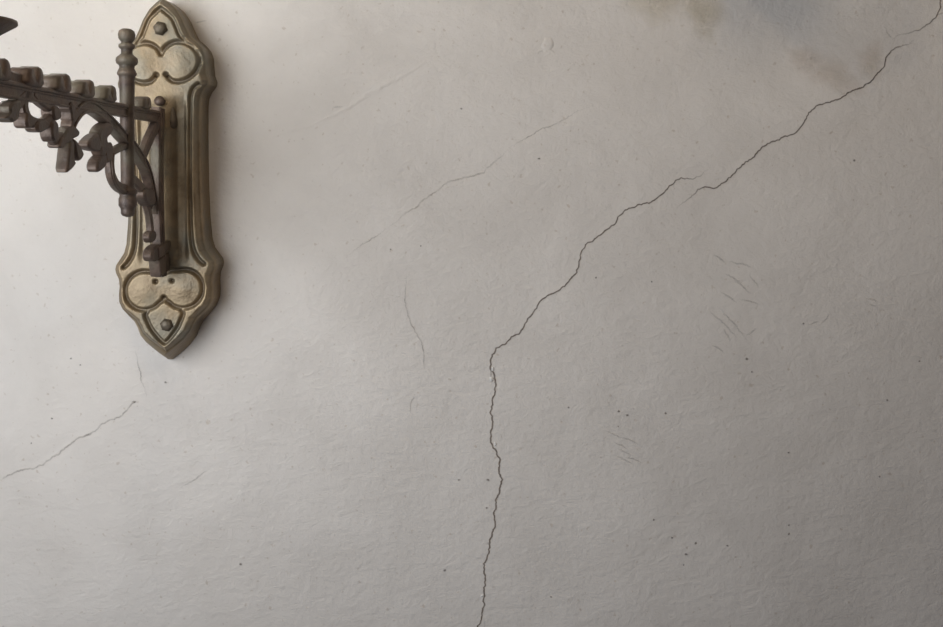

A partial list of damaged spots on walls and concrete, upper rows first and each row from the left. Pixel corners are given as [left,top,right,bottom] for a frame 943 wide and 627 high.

crack [477,48,895,627]